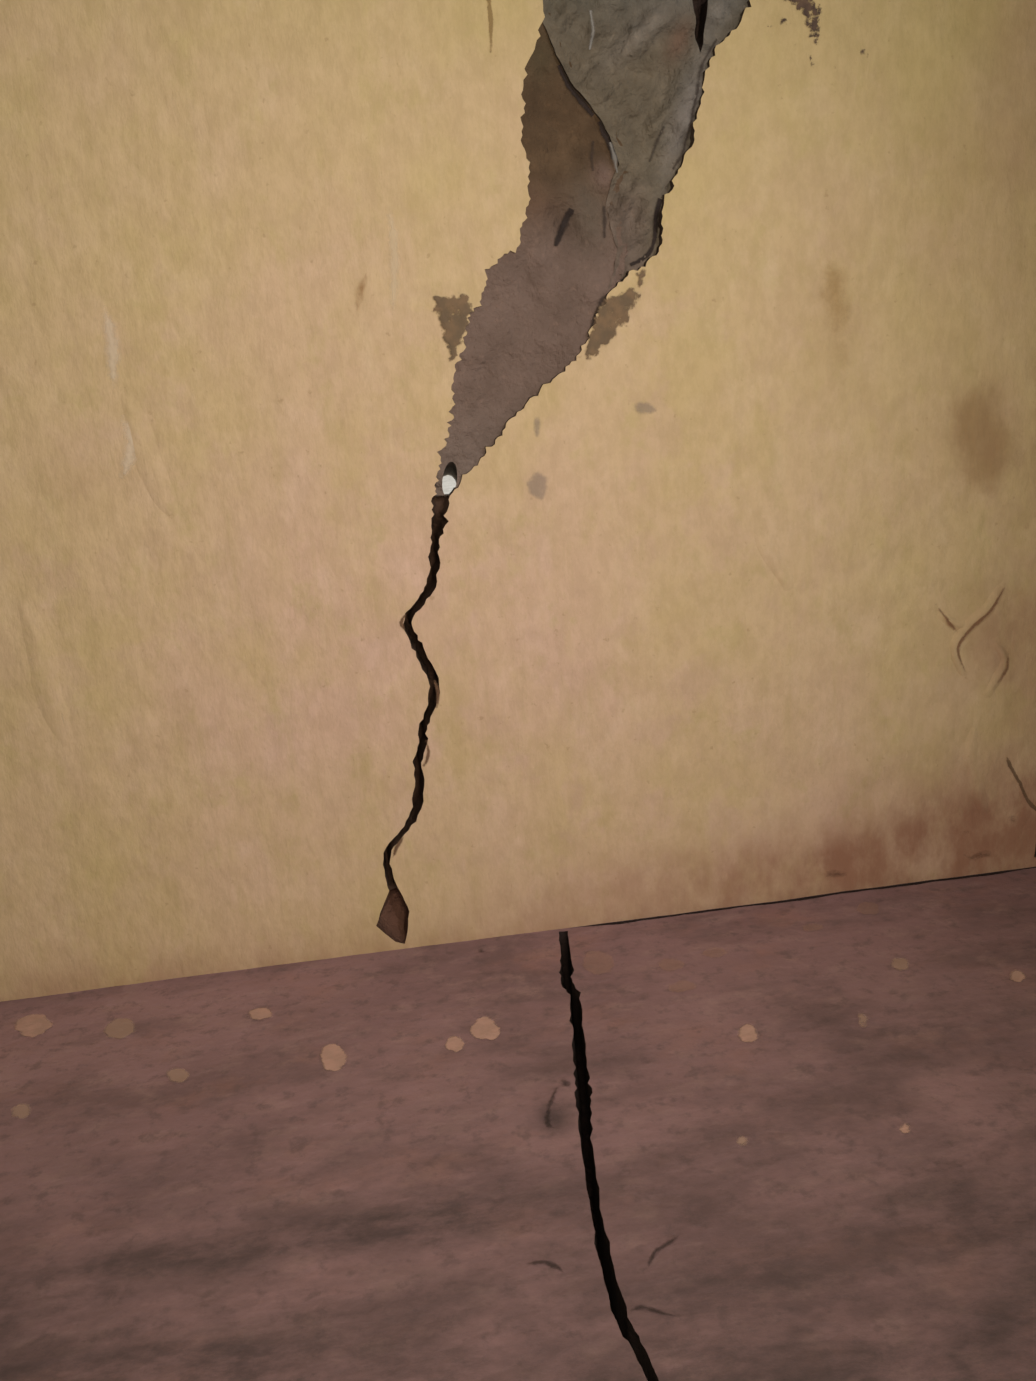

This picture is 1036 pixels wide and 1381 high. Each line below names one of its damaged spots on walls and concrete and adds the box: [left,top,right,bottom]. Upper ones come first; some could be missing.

flaking render [433,0,751,496]
crack [376,496,450,944]
crack [1007,760,1036,811]
crack [533,1261,560,1269]
crack [545,847,1036,1381]